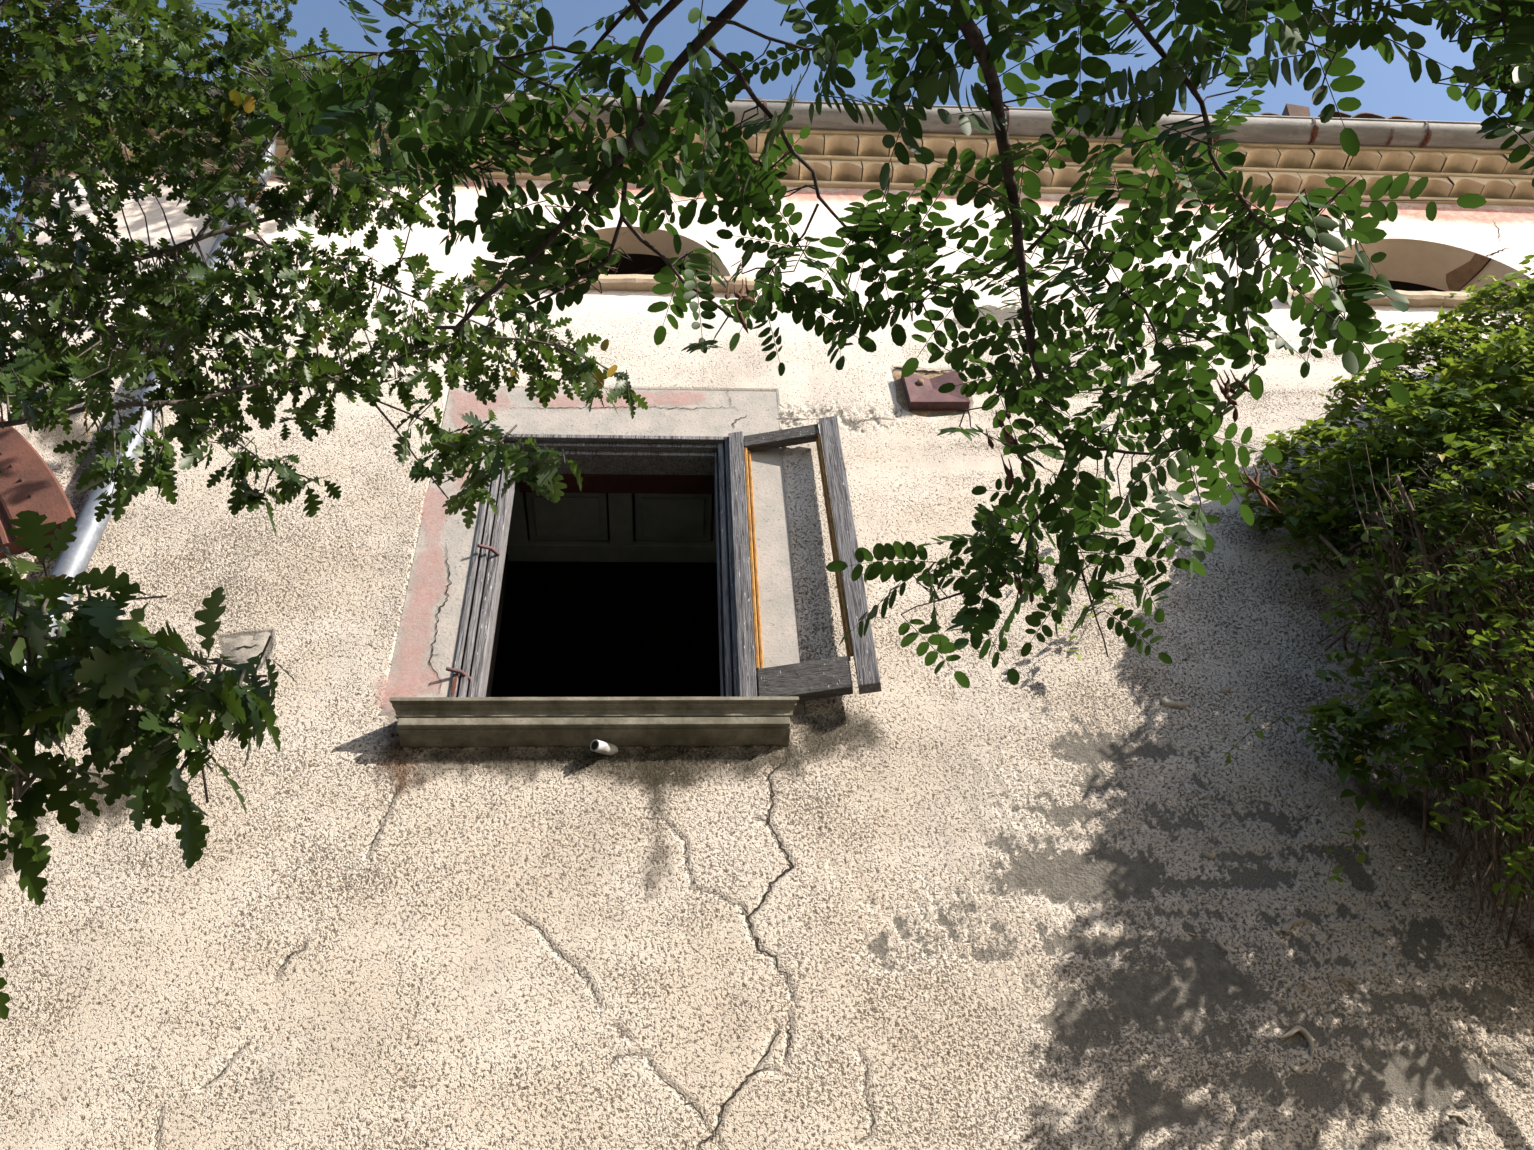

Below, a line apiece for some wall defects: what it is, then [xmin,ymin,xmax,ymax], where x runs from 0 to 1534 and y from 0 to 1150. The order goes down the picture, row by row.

crack [514,741,795,1150]
damp [1355,779,1452,843]